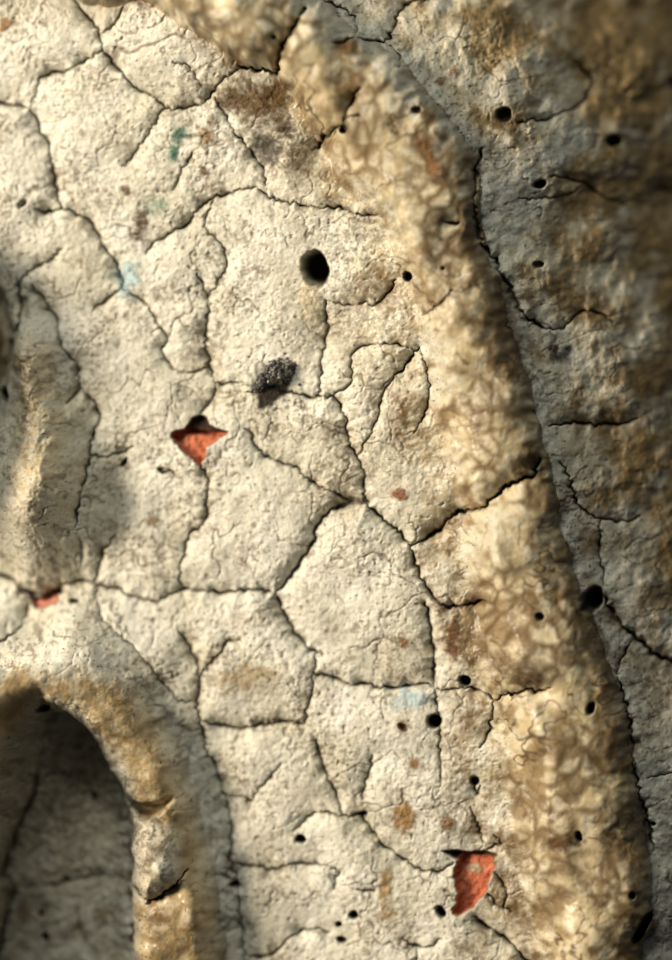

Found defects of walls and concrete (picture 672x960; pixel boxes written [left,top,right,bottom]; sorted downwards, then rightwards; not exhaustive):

crack [323,0,426,59]
crack [519,65,594,123]
crack [0,0,376,412]
crack [552,175,624,205]
crack [444,150,609,329]
peeling [172,415,227,467]
crack [551,419,635,427]
peeling [32,587,63,608]
crack [0,255,545,960]
crack [566,473,672,850]
peeling [437,850,496,916]